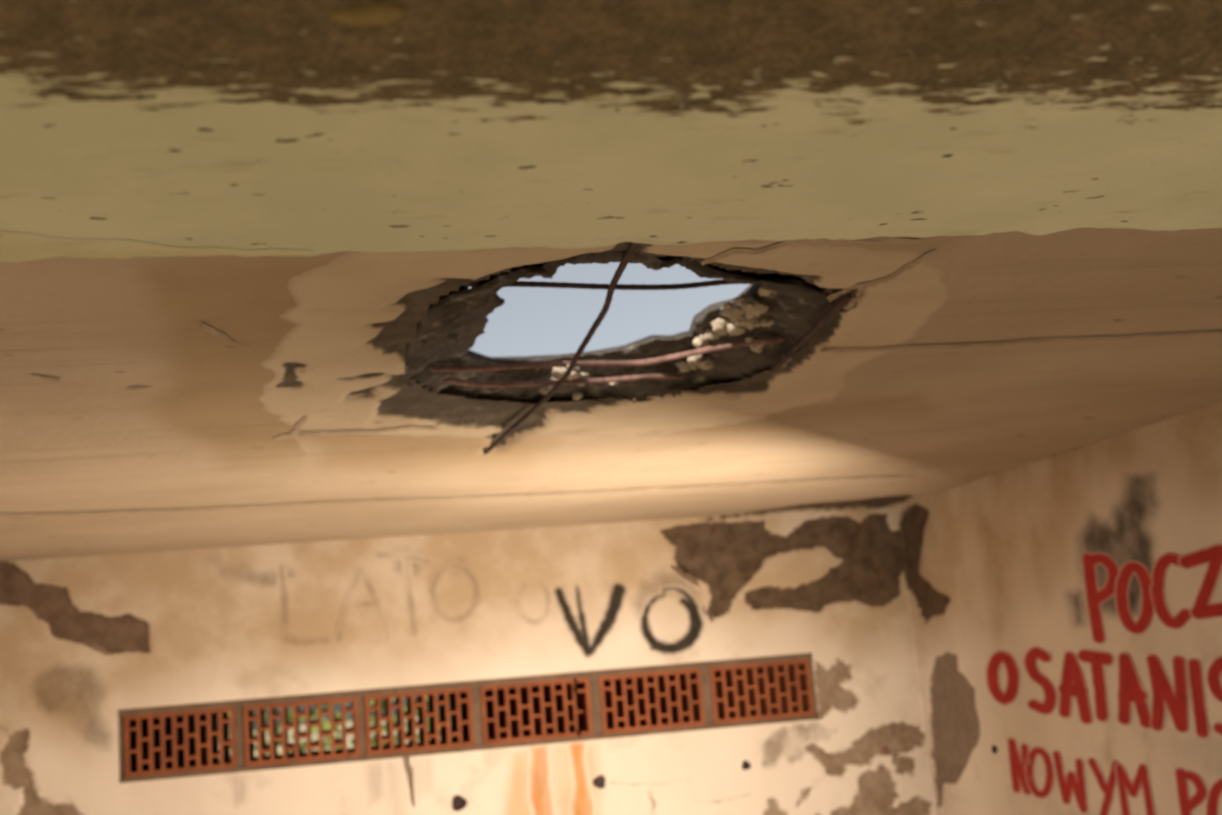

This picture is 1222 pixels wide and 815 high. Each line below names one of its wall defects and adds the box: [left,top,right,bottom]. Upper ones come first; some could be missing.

spalling [336,242,860,454]
spalling [0,561,152,655]
spalling [659,495,952,625]
spalling [0,725,85,815]
rust [500,739,607,815]
spalling [762,651,981,815]